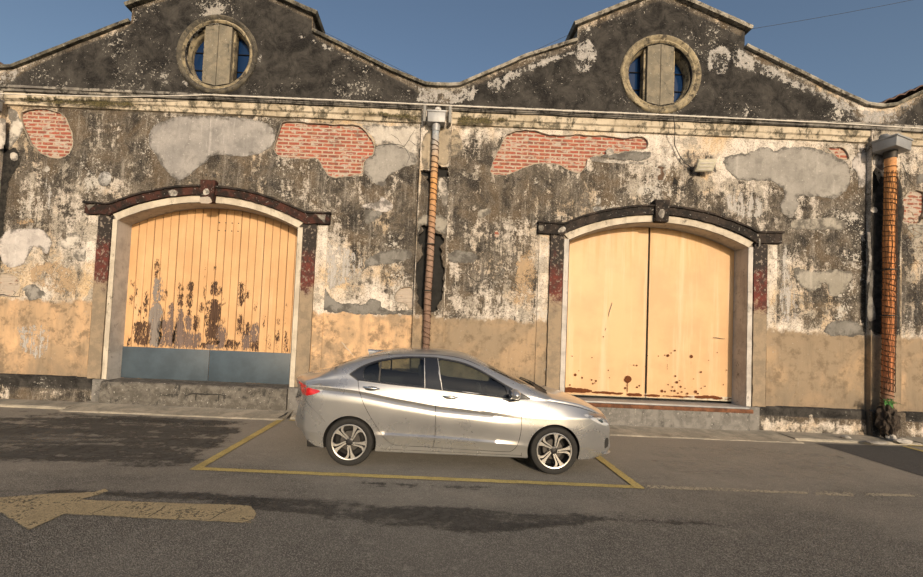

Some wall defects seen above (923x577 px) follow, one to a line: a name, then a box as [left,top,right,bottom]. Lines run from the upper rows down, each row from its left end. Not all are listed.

flaking render [7,108,73,161]
flaking render [274,121,375,178]
flaking render [490,129,666,182]
damp [0,147,21,238]
peeling [127,259,289,353]
damp [514,250,537,308]
rust [565,370,753,414]